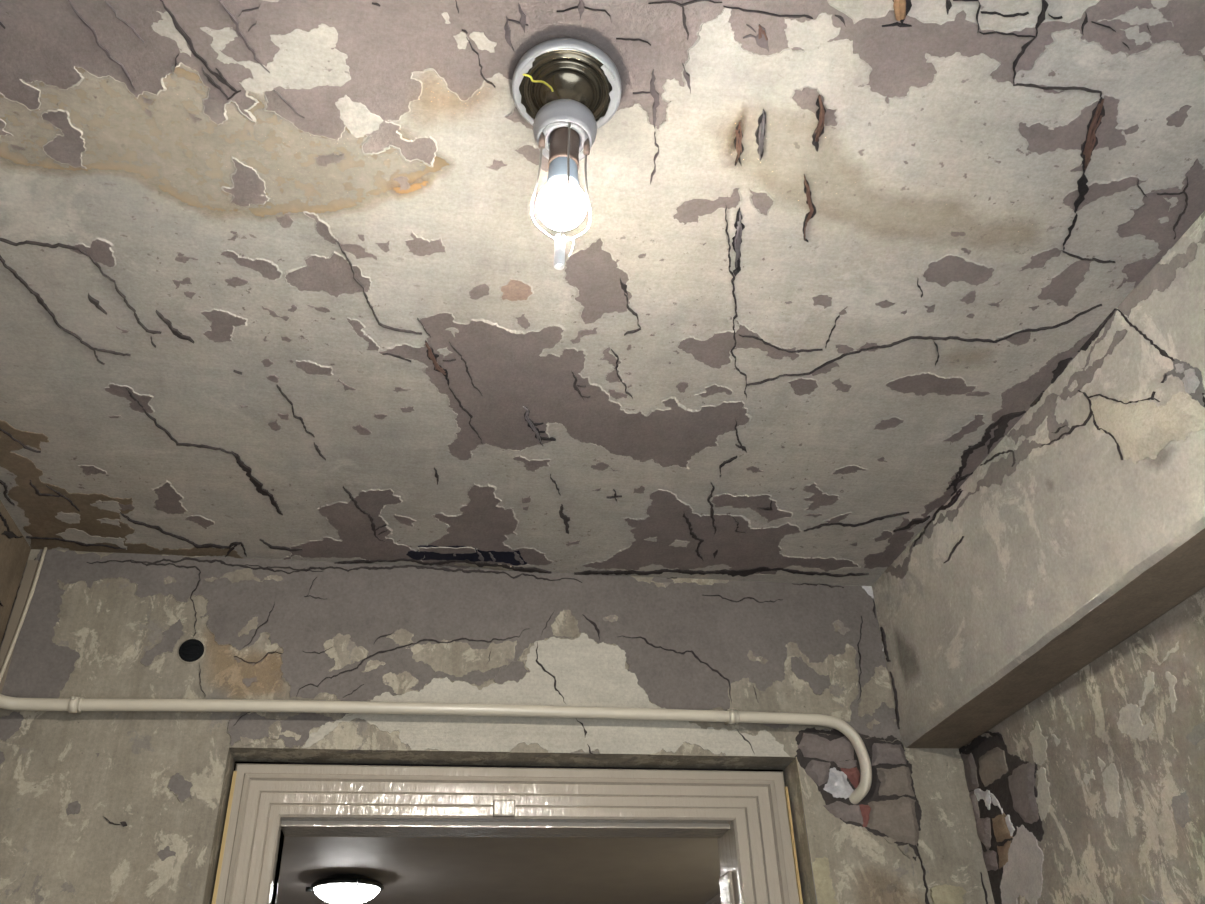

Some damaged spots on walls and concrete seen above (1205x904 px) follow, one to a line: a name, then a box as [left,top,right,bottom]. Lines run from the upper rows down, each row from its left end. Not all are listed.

peeling [200,308,248,343]
damp [0,146,450,218]
peeling [220,211,447,321]
peeling [346,237,752,472]
peeling [0,0,1205,190]
peeling [581,159,1205,579]
crack [0,207,1174,729]
peeling [0,420,922,904]
crack [234,602,758,754]
crack [915,845,930,904]
crack [980,872,988,904]
flaking render [960,721,1061,904]